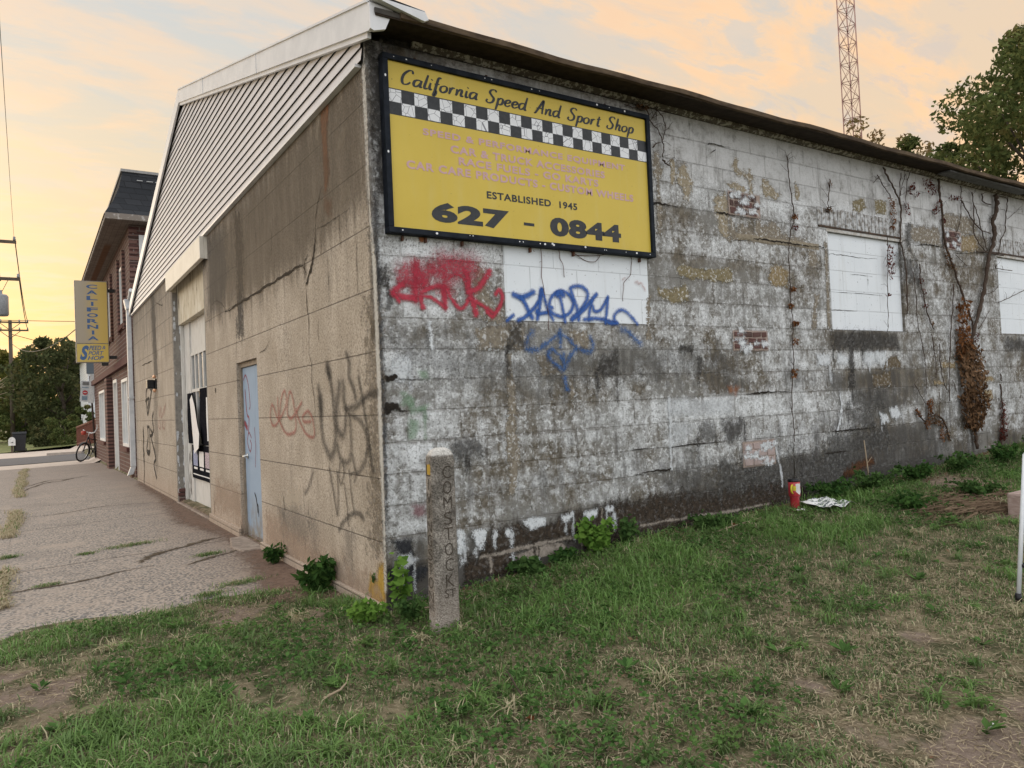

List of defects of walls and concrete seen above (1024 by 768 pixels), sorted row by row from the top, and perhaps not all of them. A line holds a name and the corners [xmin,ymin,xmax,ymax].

peeling [713,156,831,330]
peeling [910,211,979,255]
crack [214,188,358,406]
flaking render [732,326,769,354]
damp [449,437,485,466]
damp [459,330,900,586]
flaking render [742,438,778,468]
damp [387,537,428,590]